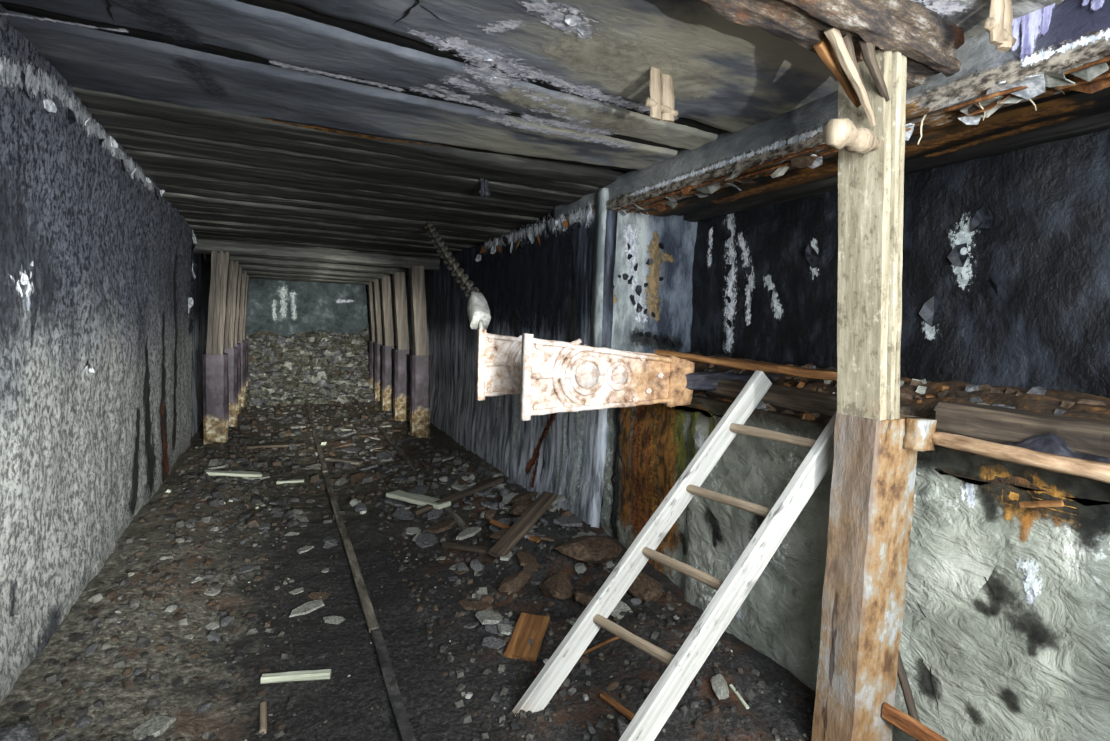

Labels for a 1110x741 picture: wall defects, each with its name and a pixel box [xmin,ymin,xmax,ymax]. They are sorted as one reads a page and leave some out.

crack [394,0,441,24]
efflorescence [707,213,755,353]
rust [982,468,1078,542]
damp [975,562,1060,656]
damp [918,659,940,699]
damp [967,707,983,724]
damp [1001,689,1021,713]